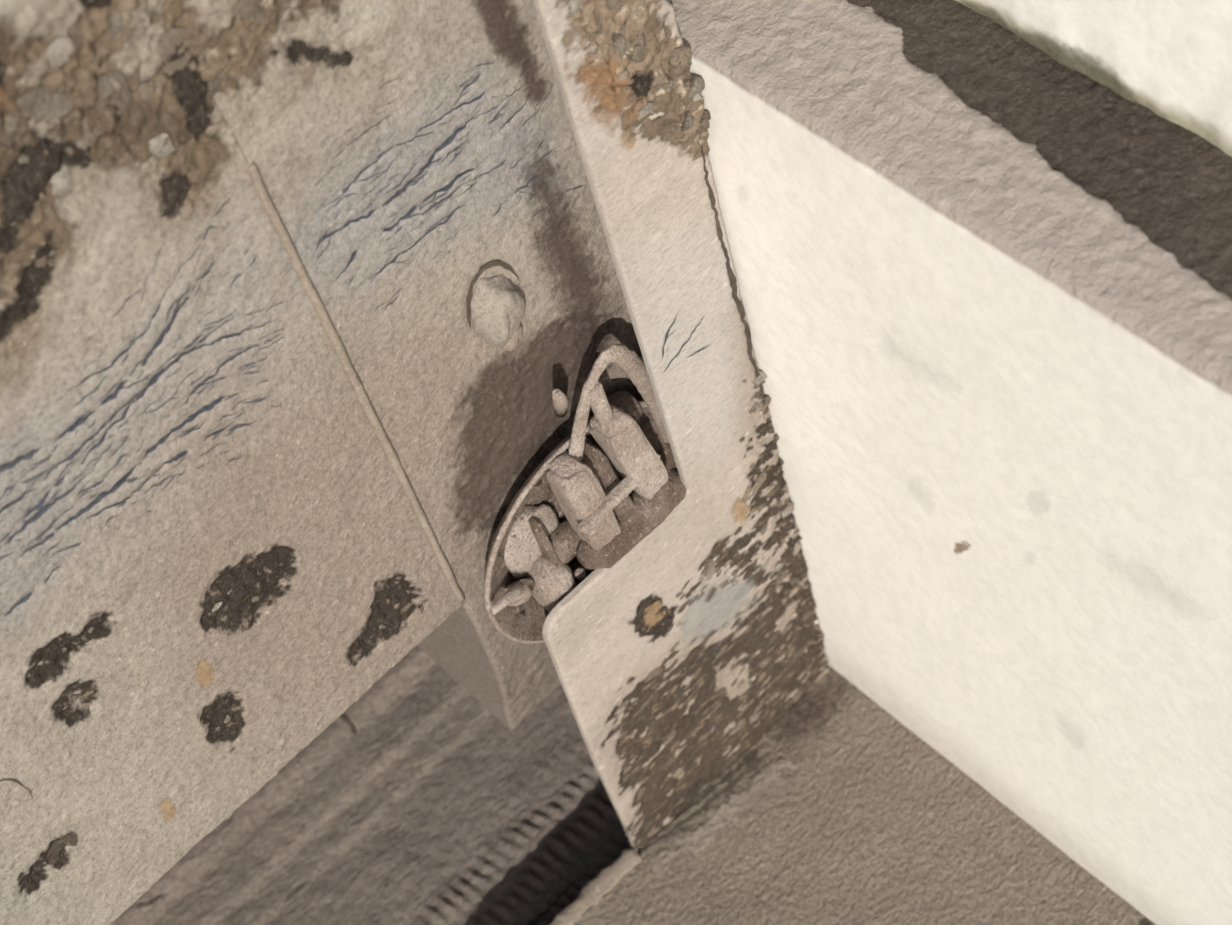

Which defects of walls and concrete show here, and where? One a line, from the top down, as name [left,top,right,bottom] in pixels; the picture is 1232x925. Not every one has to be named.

spalling [0,0,353,341]
crack [307,61,586,312]
corrosion [579,57,637,149]
peeling [556,0,710,160]
crack [0,199,296,631]
water stain [457,314,608,533]
crack [662,313,724,373]
peeling [601,370,828,849]